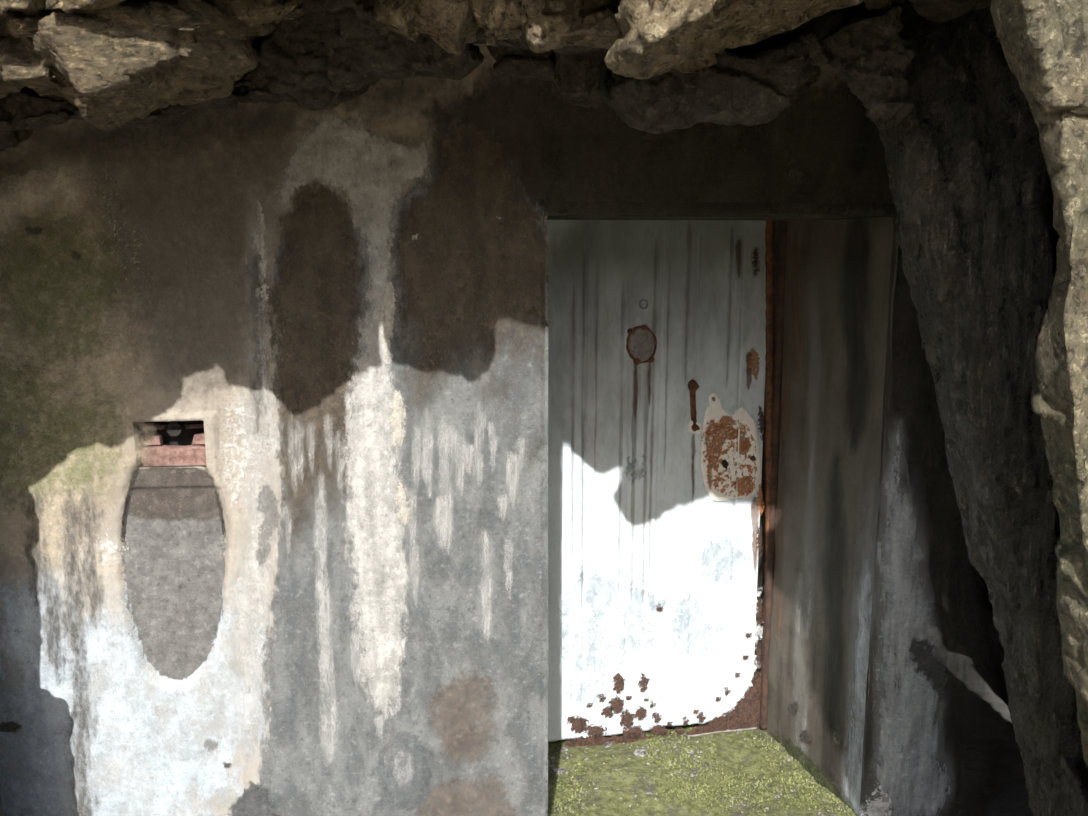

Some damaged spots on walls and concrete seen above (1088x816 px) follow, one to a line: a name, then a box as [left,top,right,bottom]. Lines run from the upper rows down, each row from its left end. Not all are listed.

damp [0,102,299,659]
damp [225,67,987,816]
rust [633,357,655,417]
rust [692,221,774,571]
damp [69,660,92,816]